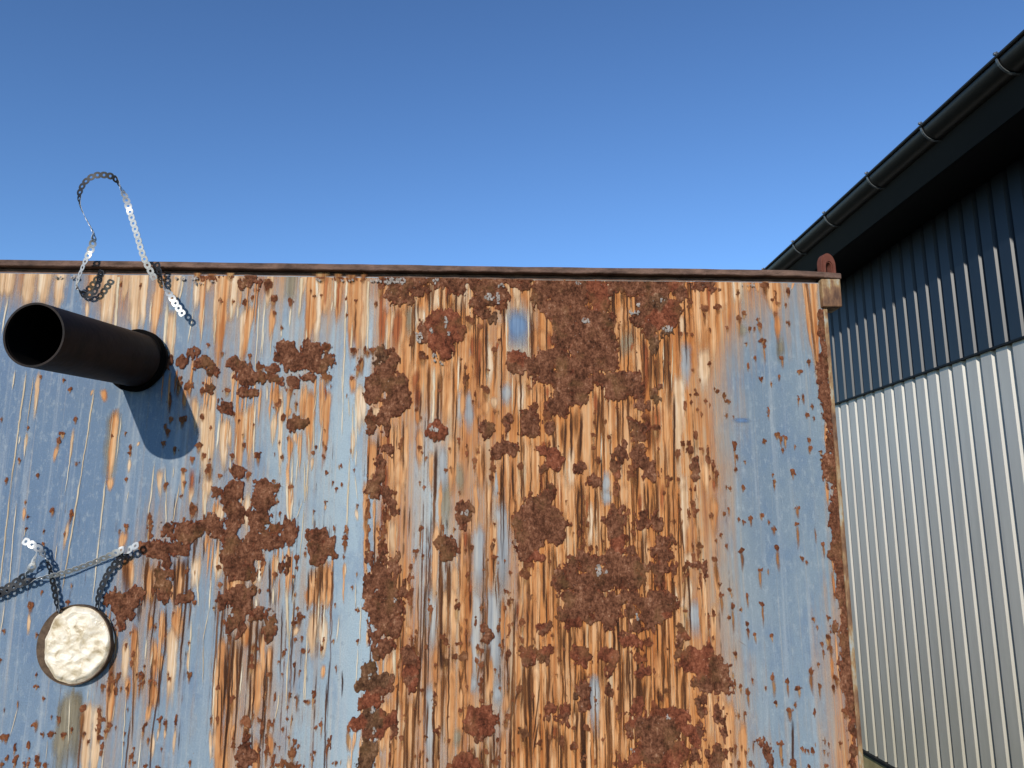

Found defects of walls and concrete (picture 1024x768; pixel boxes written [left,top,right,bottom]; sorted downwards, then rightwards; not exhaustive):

rust [0,272,859,768]